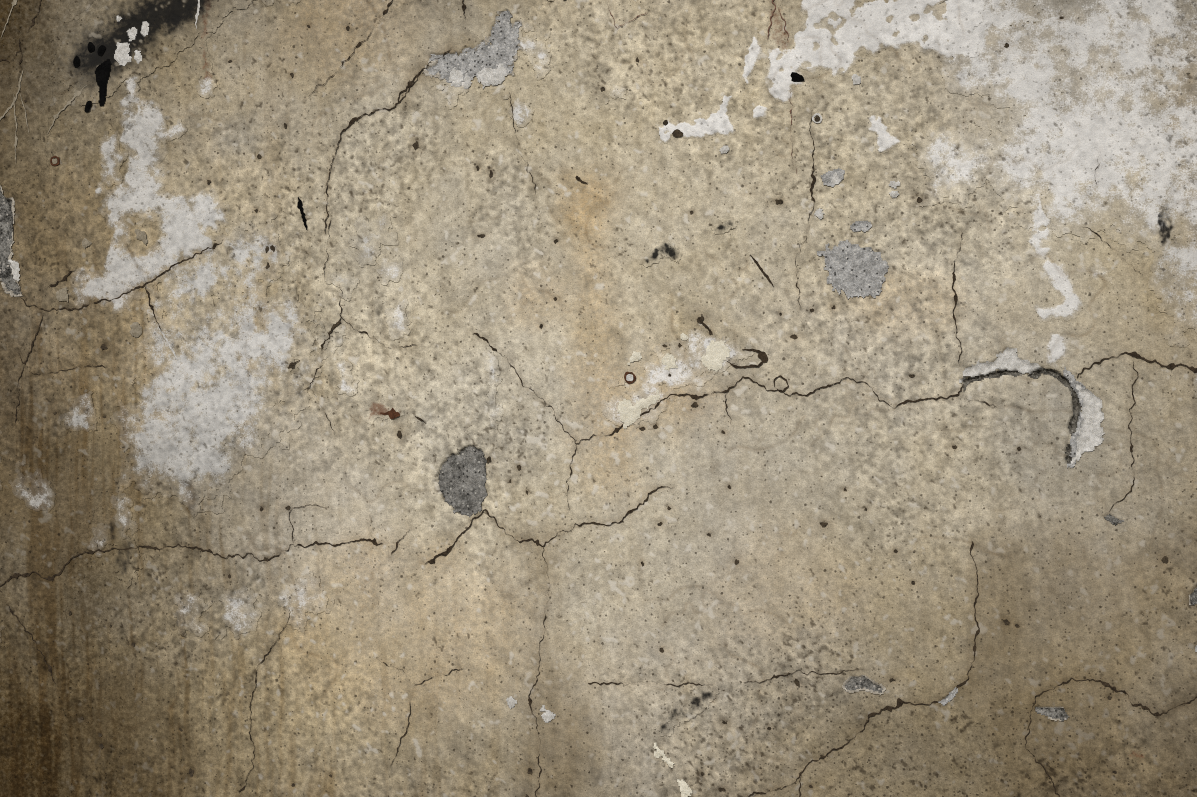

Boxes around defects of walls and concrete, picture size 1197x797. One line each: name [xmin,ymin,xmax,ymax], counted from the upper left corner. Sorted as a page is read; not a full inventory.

spalling [423,9,523,109]
spalling [0,186,23,297]
crack [293,50,450,429]
leakage [1156,203,1177,253]
leakage [0,281,243,797]
crack [0,504,409,685]
spalling [438,446,491,517]
crack [421,234,996,797]
spalling [959,333,1105,468]
leakage [949,512,1197,797]
crack [1077,351,1197,512]
crack [1025,678,1197,797]